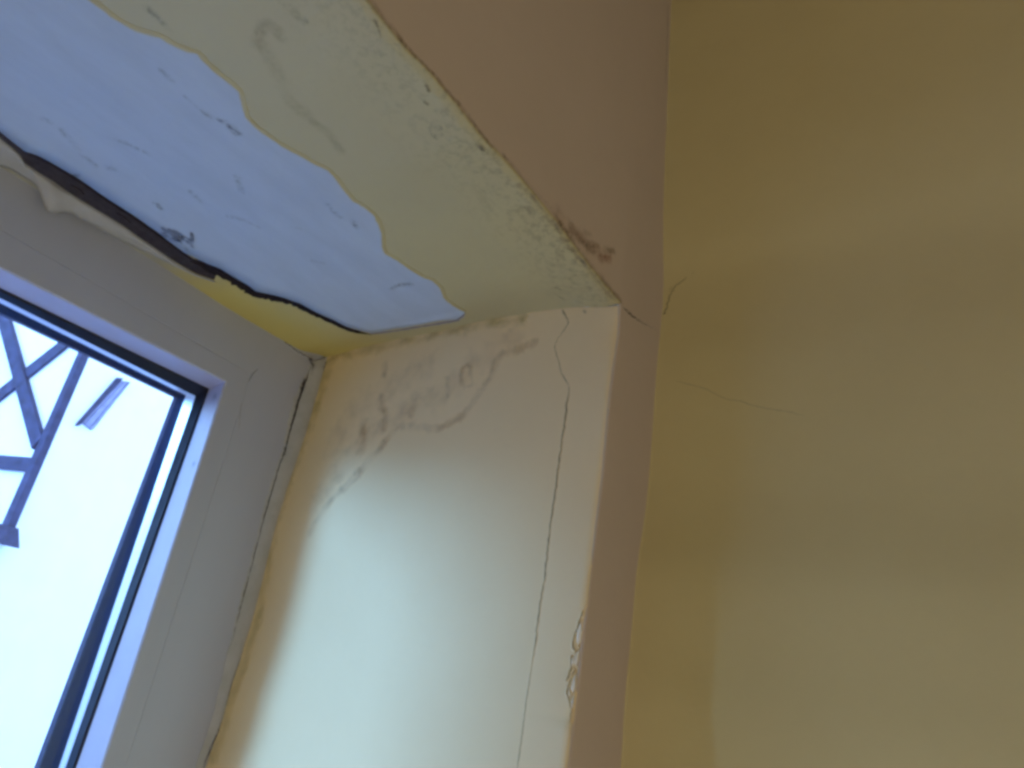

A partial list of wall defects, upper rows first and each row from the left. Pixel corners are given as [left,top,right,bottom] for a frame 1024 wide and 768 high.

peeling [0,0,466,333]
crack [517,310,570,768]
flaking render [565,611,585,722]